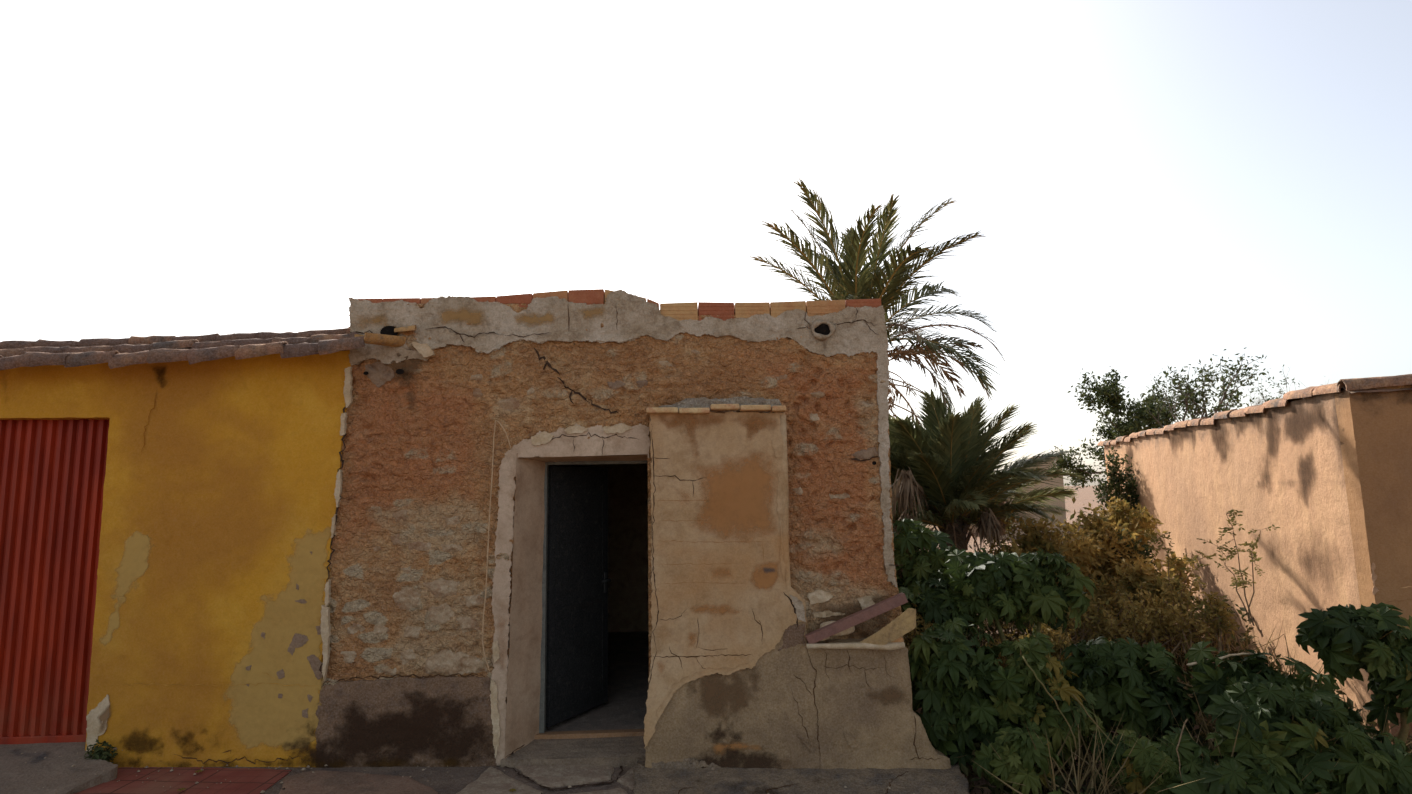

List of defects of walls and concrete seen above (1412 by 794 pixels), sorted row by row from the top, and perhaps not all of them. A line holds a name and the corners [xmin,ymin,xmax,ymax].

peeling [422,328,648,354]
peeling [340,367,353,436]
leakage [1212,402,1324,458]
leakage [1299,457,1313,499]
crack [429,308,890,752]
peeling [100,531,150,644]
peeling [226,470,501,758]
spalling [778,590,845,651]
peeling [657,663,752,718]
leakage [289,693,495,768]